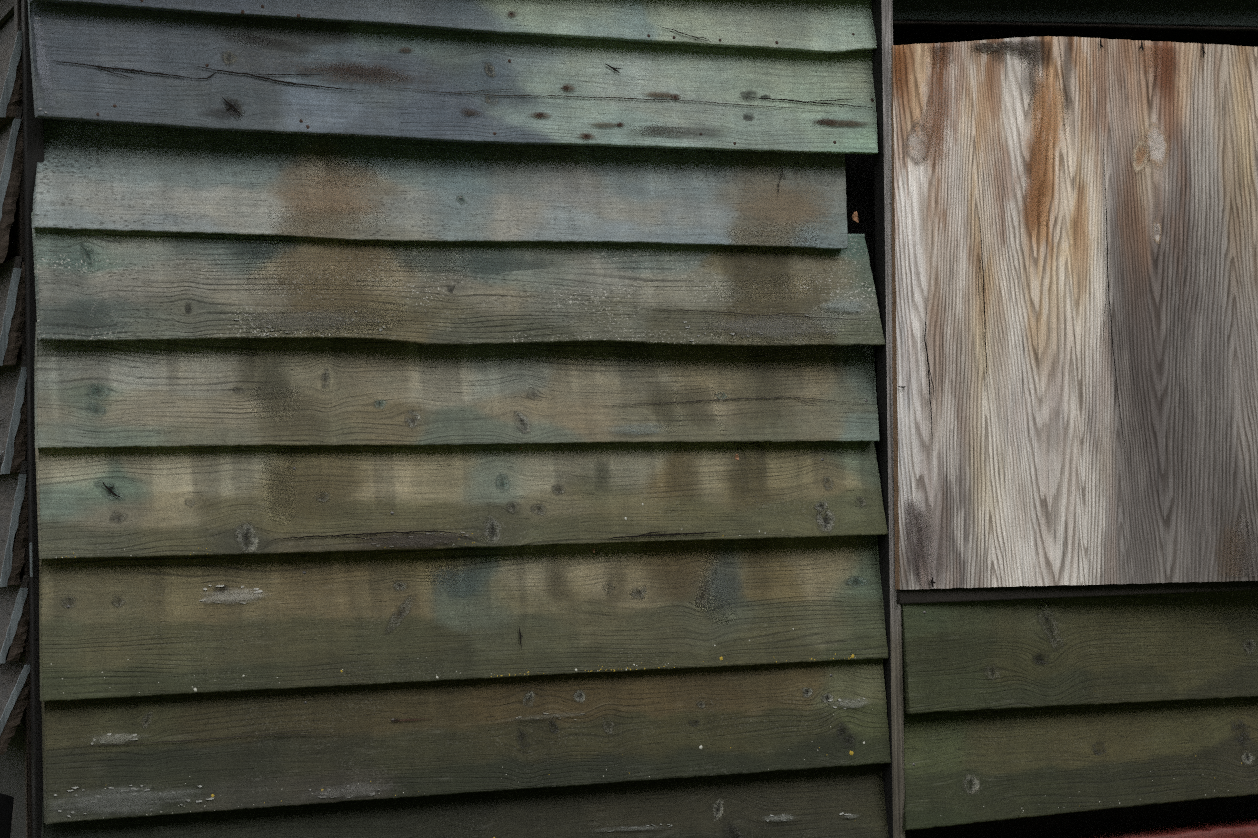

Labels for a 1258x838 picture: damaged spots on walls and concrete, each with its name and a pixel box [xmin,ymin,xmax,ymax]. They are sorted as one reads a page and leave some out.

crack [48,60,872,116]
rust [581,122,624,139]
peeling [199,585,263,604]
peeling [91,733,138,744]
peeling [54,785,214,817]
peeling [607,824,672,832]